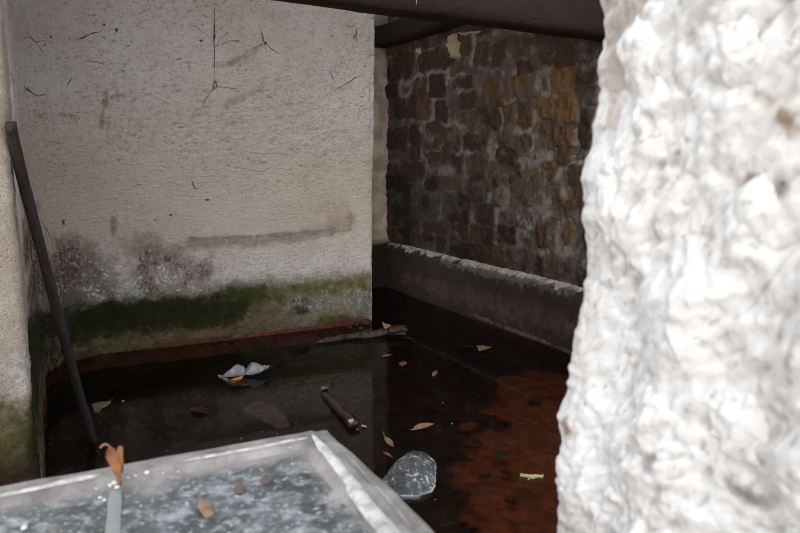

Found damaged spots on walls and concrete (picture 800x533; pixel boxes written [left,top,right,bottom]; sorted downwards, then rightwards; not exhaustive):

crack [253,25,278,53]
flaking render [446,31,481,59]
leakage [22,218,49,310]
leakage [50,239,107,308]
leakage [71,287,265,340]